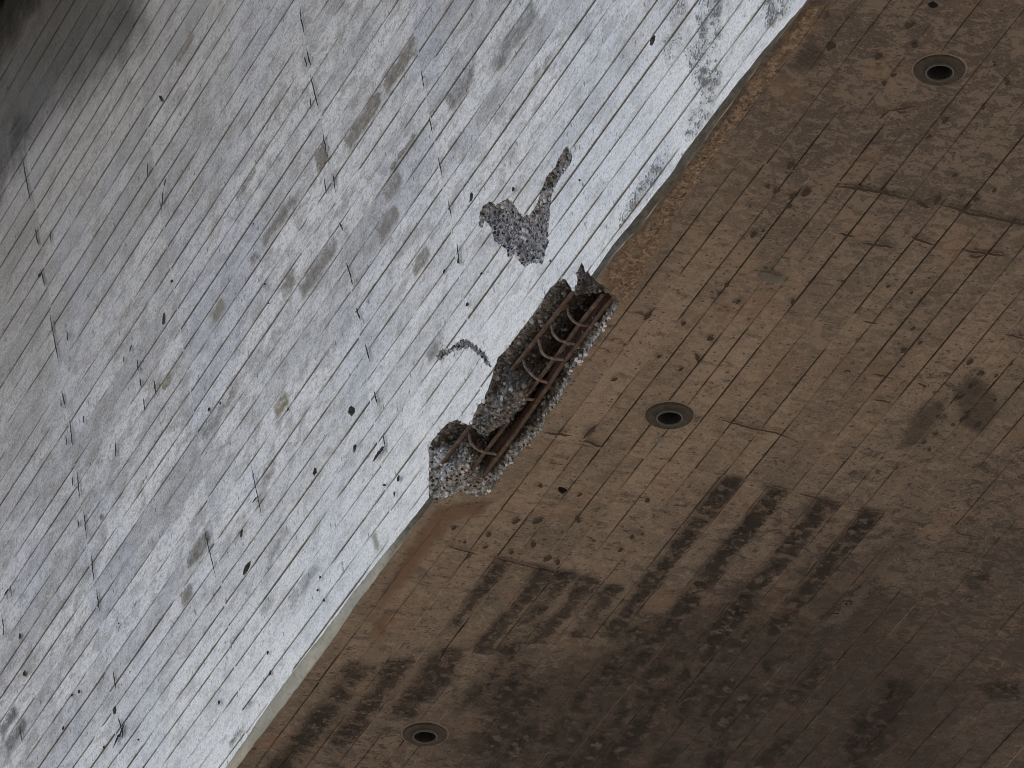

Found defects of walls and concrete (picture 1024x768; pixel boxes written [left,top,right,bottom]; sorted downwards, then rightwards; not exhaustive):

spalling [469,146,572,267]
crack [835,186,1024,226]
spalling [427,263,619,500]